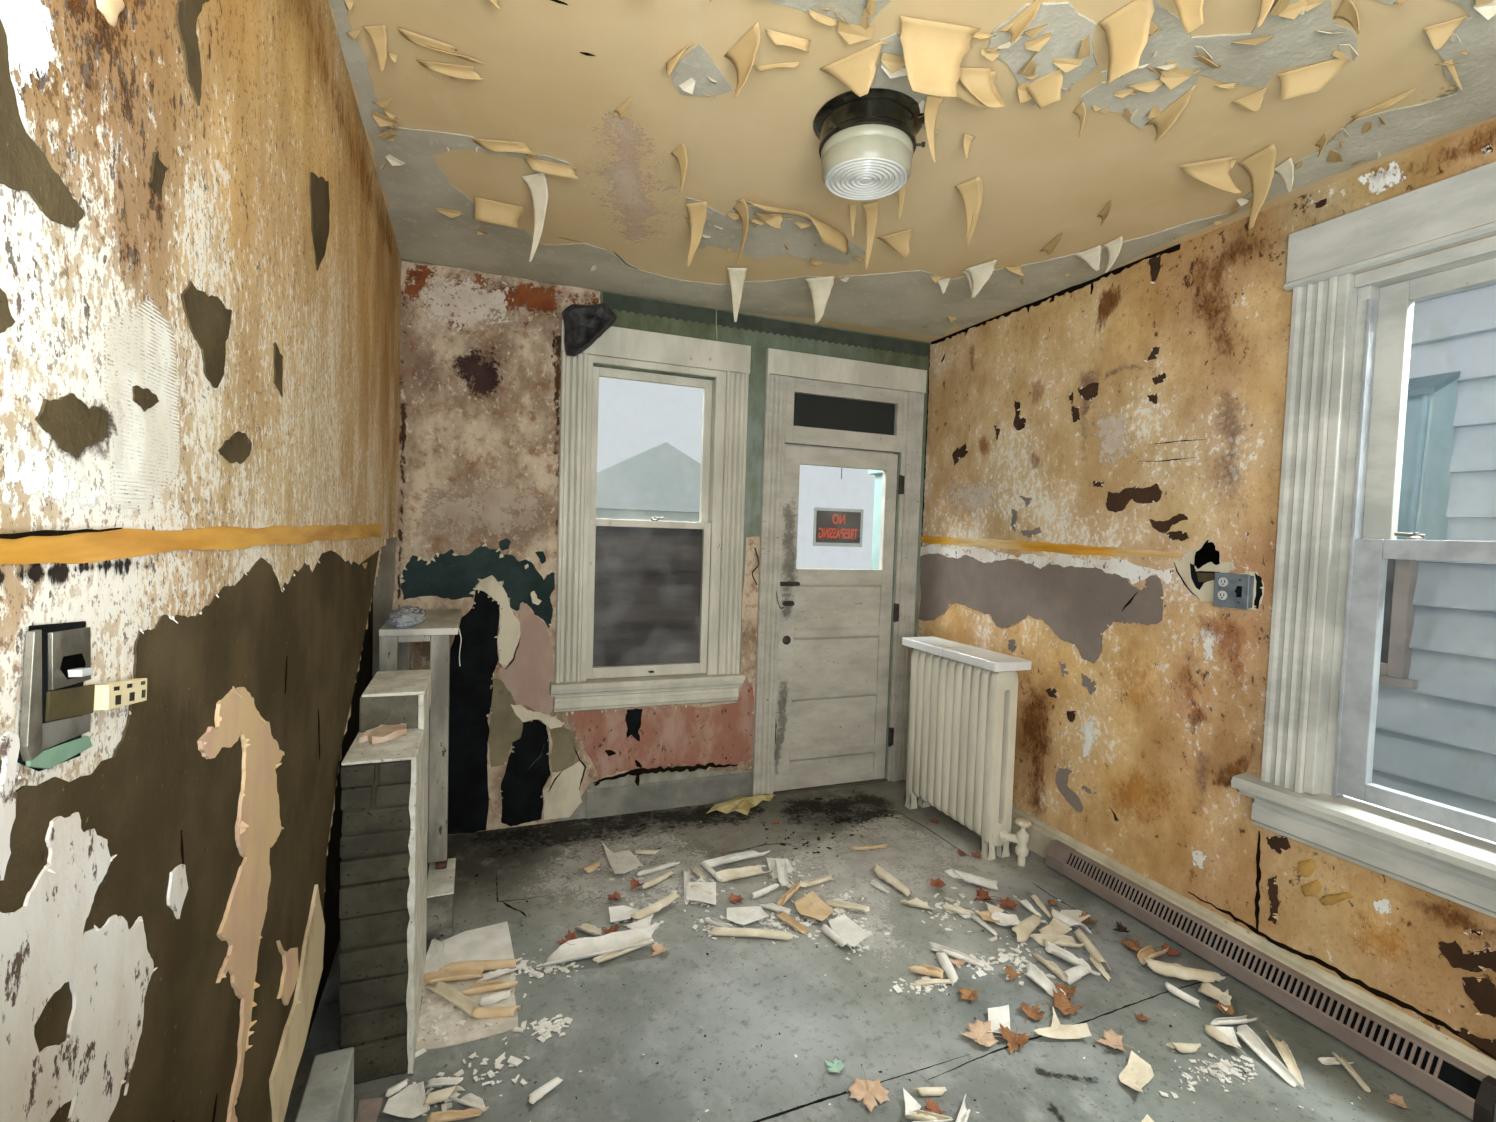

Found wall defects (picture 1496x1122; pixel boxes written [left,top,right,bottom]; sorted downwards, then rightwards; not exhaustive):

flaking render [0,19,84,228]
peeling [808,0,1360,163]
flaking render [35,393,109,458]
flaking render [181,281,232,388]
leakage [397,403,407,608]
leakage [422,476,558,544]
leakage [400,262,599,487]
spalling [400,538,755,834]
flaking render [918,480,1264,726]
flaking render [0,550,379,1122]
crack [1188,831,1496,1060]
peeling [383,1077,489,1122]